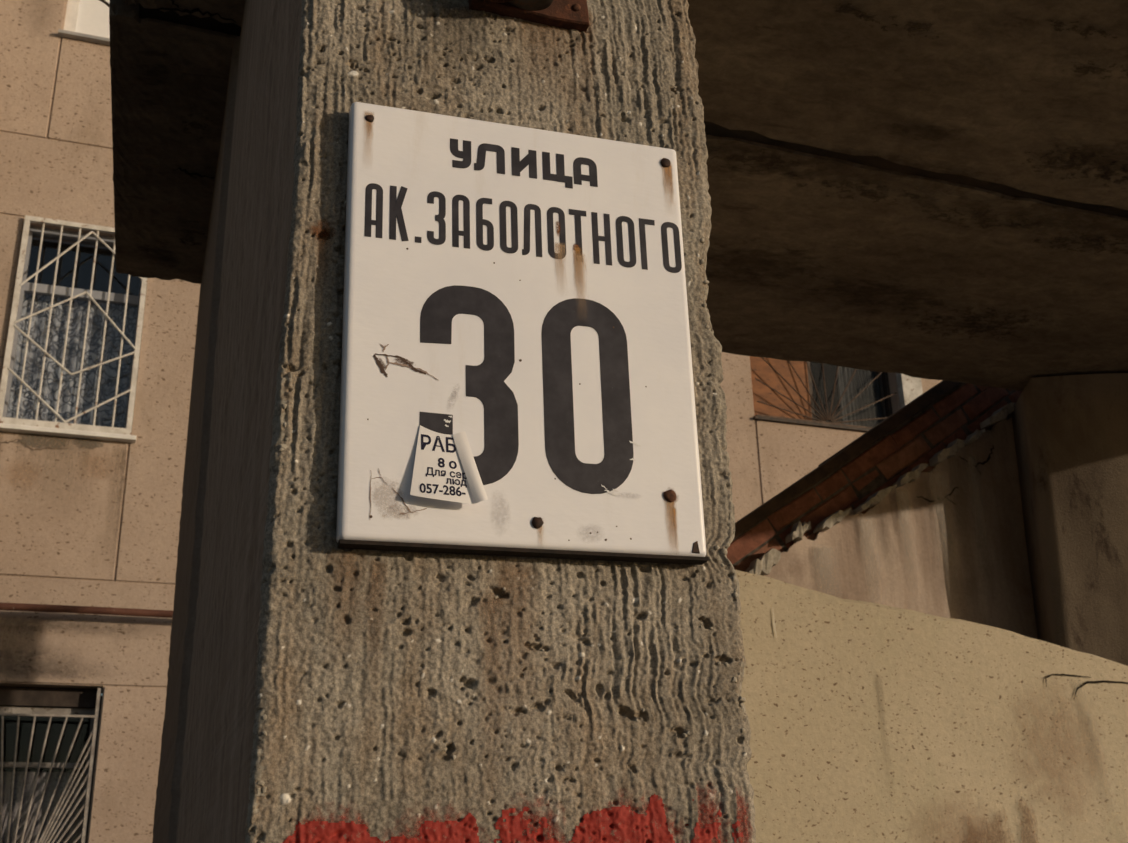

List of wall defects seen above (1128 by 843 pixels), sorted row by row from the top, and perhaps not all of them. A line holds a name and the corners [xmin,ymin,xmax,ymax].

rust [555,222,586,282]
rust [666,489,677,529]
flaking render [713,402,1016,600]
crack [1045,674,1128,698]